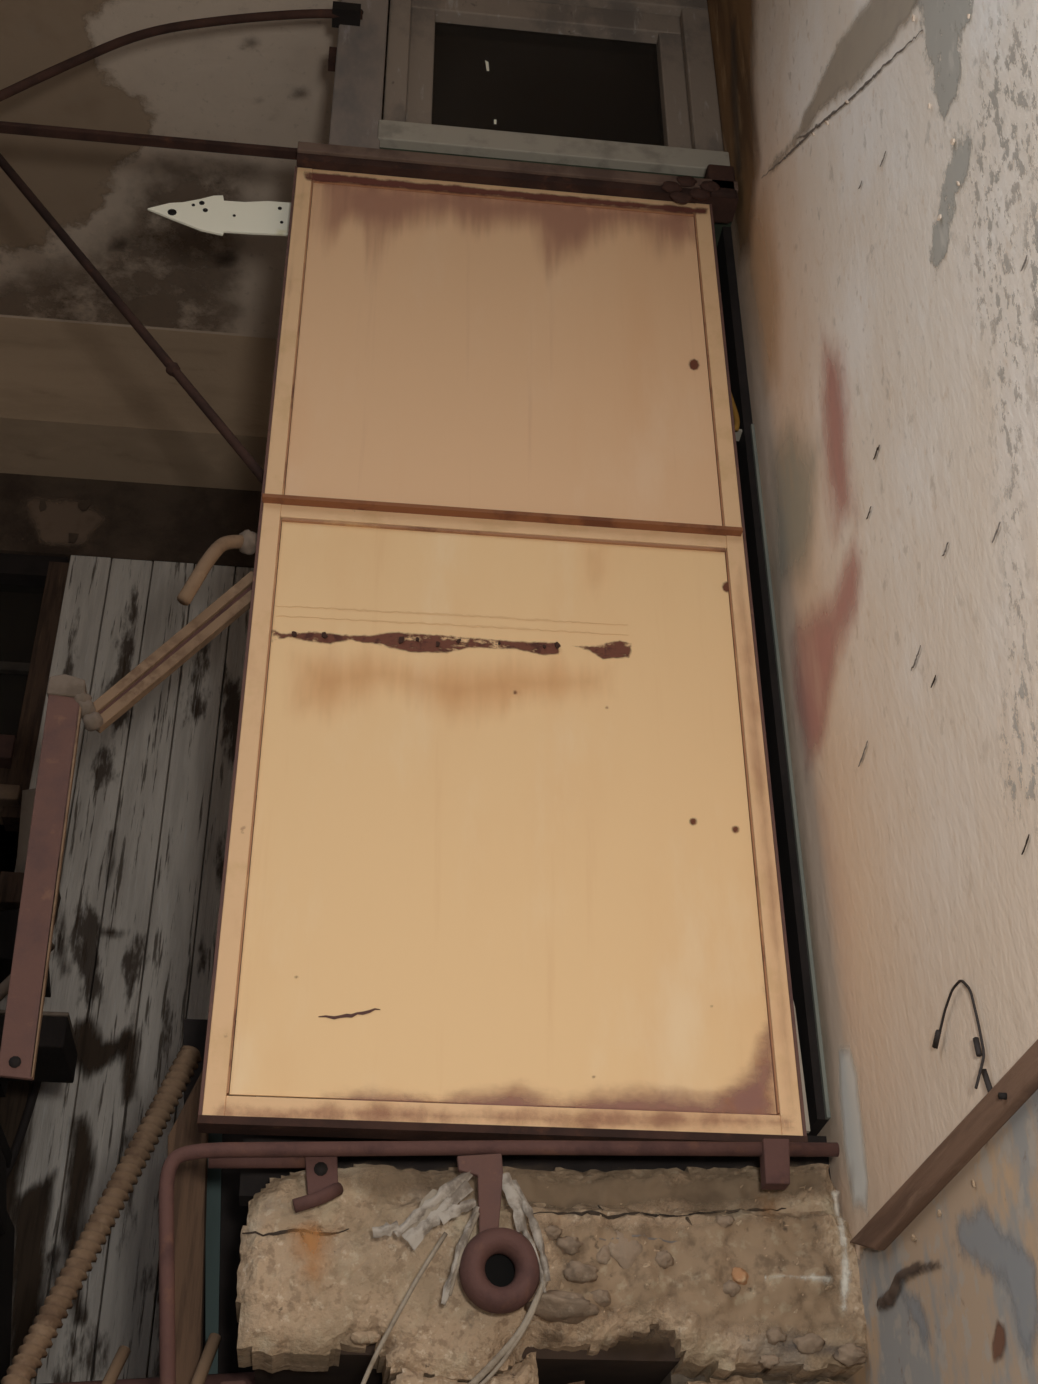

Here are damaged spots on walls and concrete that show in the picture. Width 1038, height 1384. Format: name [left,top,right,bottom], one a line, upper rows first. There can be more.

damp [0,0,155,251]
damp [0,172,234,332]
damp [707,0,771,336]
crack [762,30,923,178]
peeling [912,0,973,119]
peeling [930,29,1038,455]
peeling [1006,655,1038,799]
crack [533,1205,786,1243]
peeling [543,1089,1038,1384]